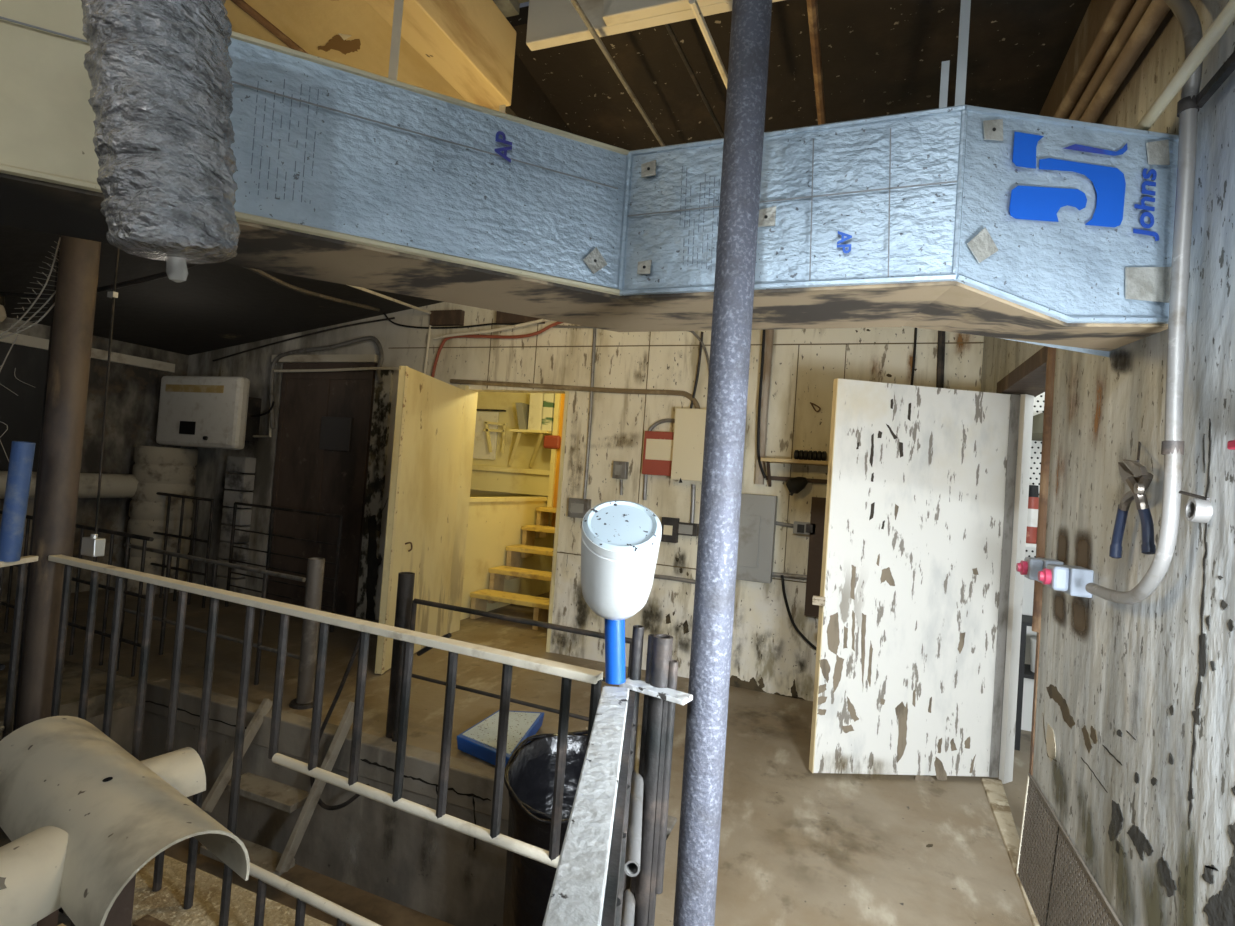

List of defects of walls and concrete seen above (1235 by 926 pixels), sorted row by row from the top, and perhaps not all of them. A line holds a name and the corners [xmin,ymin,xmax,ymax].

peeling [856,424,903,482]
peeling [869,502,899,530]
peeling [876,554,895,586]
peeling [729,565,873,733]
crack [1188,418,1211,830]
peeling [880,689,932,763]
peeling [915,737,976,781]
spalling [1046,684,1098,753]
peeling [1108,800,1188,901]
peeling [1202,823,1235,926]